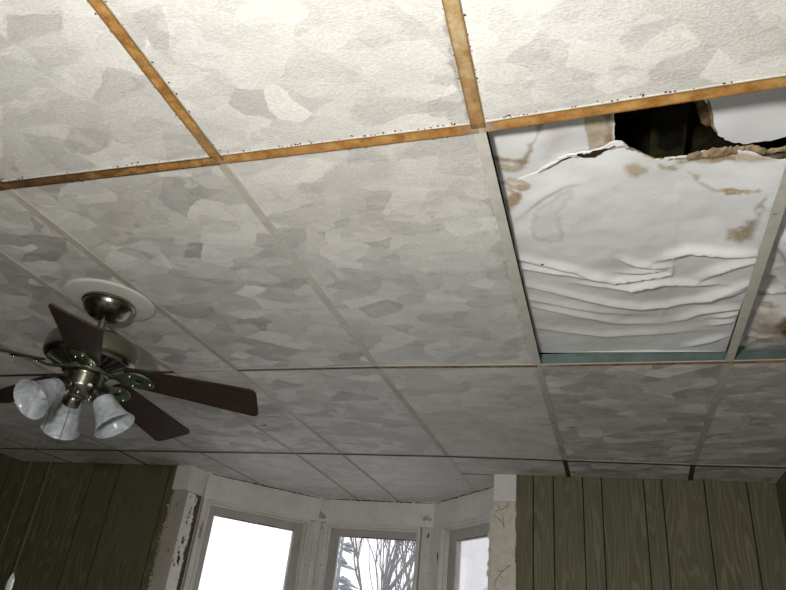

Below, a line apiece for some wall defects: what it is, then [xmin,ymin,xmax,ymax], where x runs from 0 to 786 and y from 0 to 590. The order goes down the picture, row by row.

rust [0,0,786,191]
leakage [496,150,531,209]
leakage [728,222,753,240]
peeling [165,492,198,590]